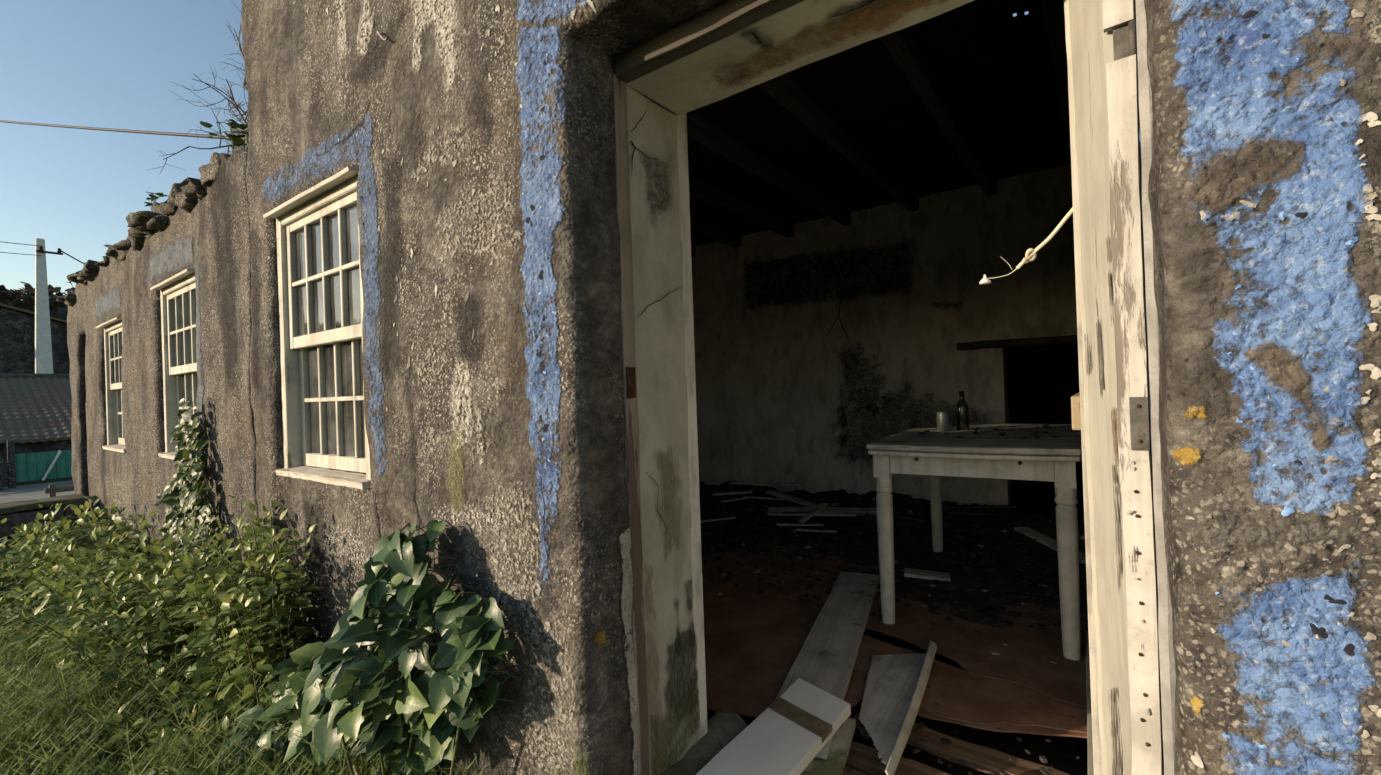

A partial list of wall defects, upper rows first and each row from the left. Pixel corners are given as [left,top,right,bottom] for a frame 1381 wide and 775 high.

peeling [401,125,470,186]
peeling [435,0,596,775]
peeling [1169,0,1381,775]
peeling [619,528,638,775]
damp [648,579,698,775]